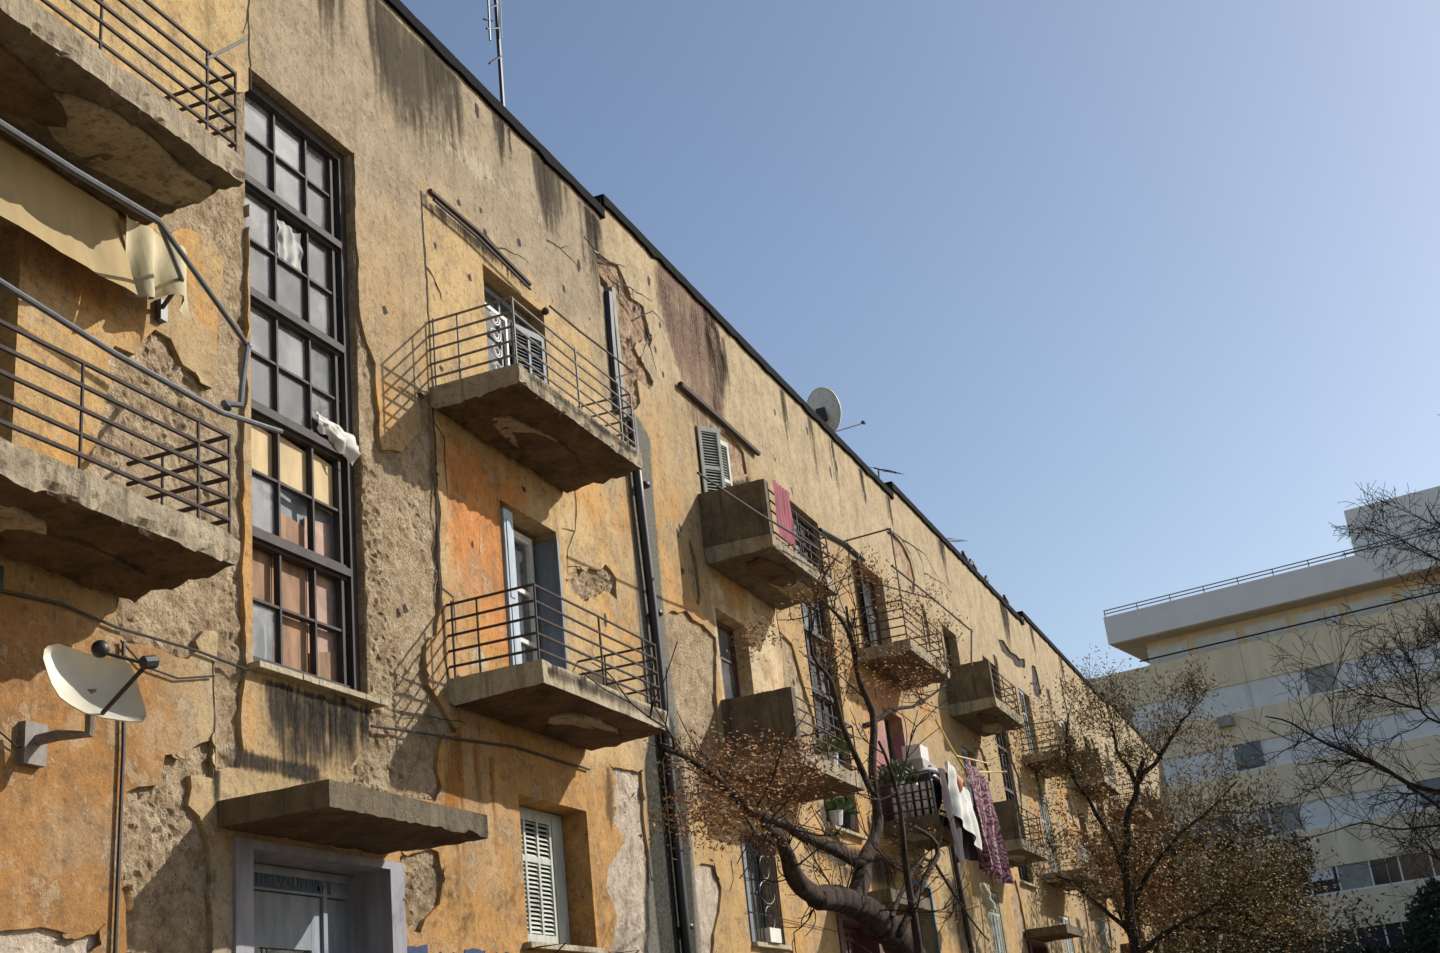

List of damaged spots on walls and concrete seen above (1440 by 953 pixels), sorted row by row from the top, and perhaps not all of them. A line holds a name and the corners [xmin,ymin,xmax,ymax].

damp [368,0,604,285]
flaking render [0,44,246,541]
crack [484,232,659,371]
damp [695,309,730,411]
flaking render [346,232,453,801]
flaking render [566,566,614,601]
flaking render [0,505,243,953]
damp [229,680,378,785]
spalling [544,713,621,747]
flaking render [664,611,718,829]
flaking render [399,849,446,931]
flaking render [606,768,653,953]